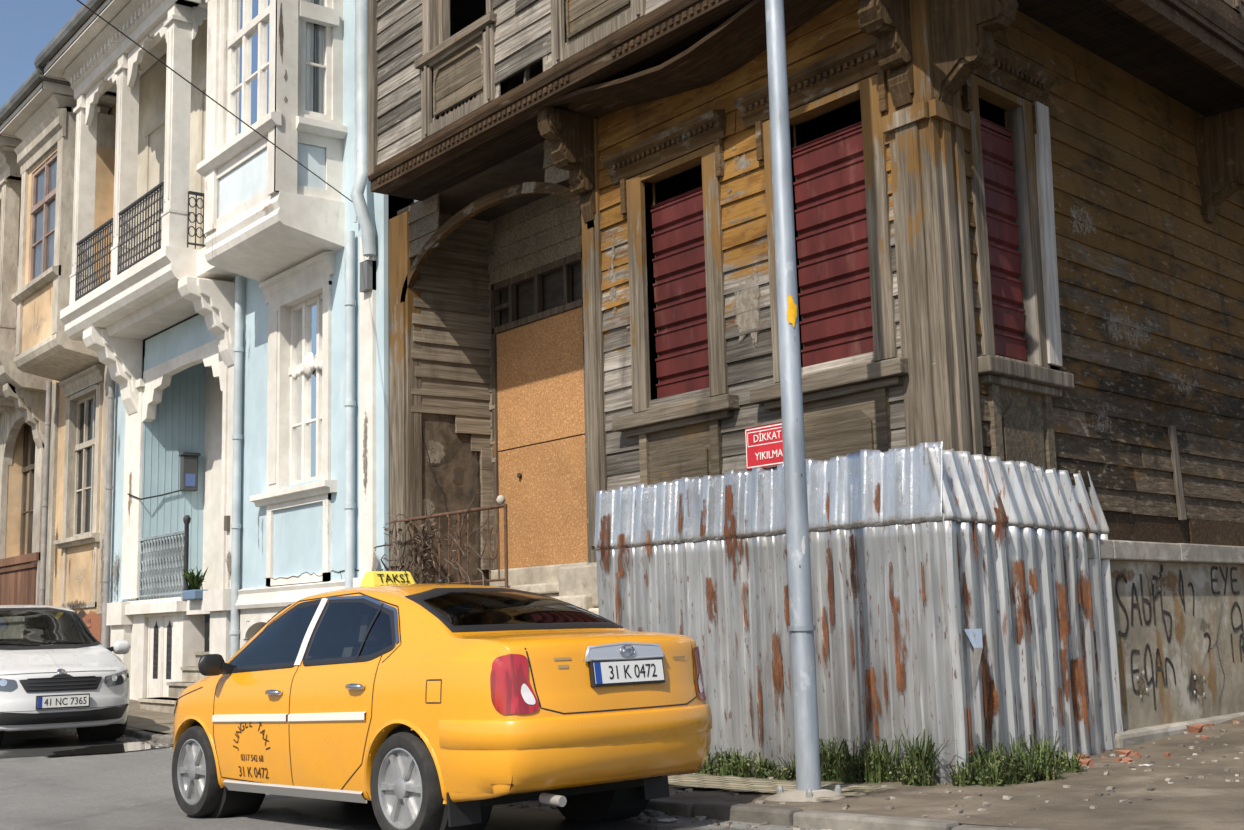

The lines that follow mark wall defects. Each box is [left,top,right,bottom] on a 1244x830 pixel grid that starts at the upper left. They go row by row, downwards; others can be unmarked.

peeling [732,147,750,175]
peeling [733,264,764,349]
rust [597,513,629,625]
rust [724,484,748,630]
rust [749,585,790,747]
rust [821,482,834,675]
rust [849,534,908,743]
rust [956,494,1008,629]
rust [966,634,999,757]
rust [1011,559,1040,644]
rust [1056,542,1099,746]
rust [1117,636,1127,711]